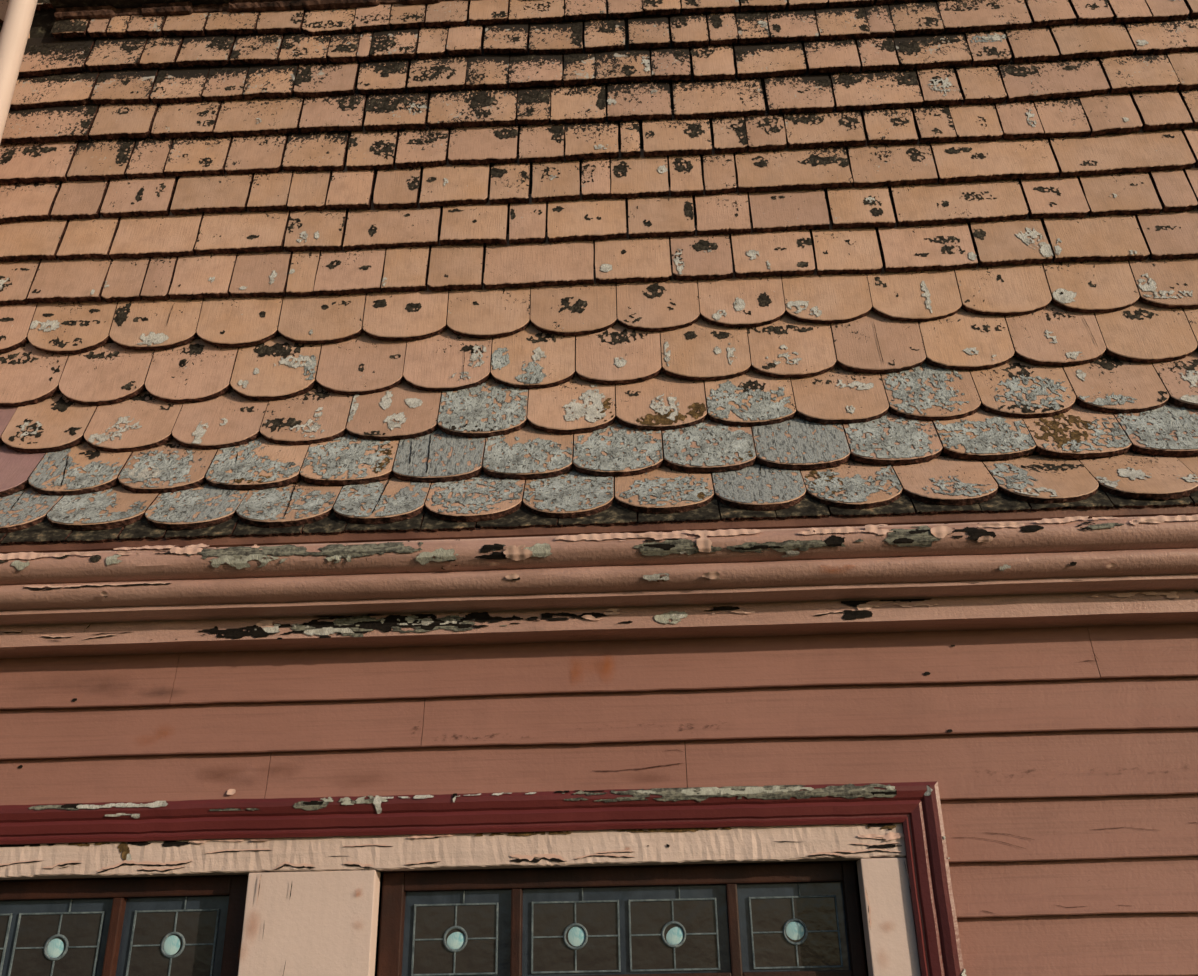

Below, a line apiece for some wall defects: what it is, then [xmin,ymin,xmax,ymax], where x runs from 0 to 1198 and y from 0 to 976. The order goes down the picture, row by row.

peeling [206,11,550,139]
peeling [892,72,955,134]
peeling [729,90,860,168]
peeling [0,144,57,165]
peeling [348,132,448,159]
peeling [0,542,459,570]
peeling [475,514,1198,580]
peeling [199,608,633,640]
peeling [293,795,434,814]
peeling [554,784,897,802]
peeling [0,839,265,861]
peeling [809,824,904,858]